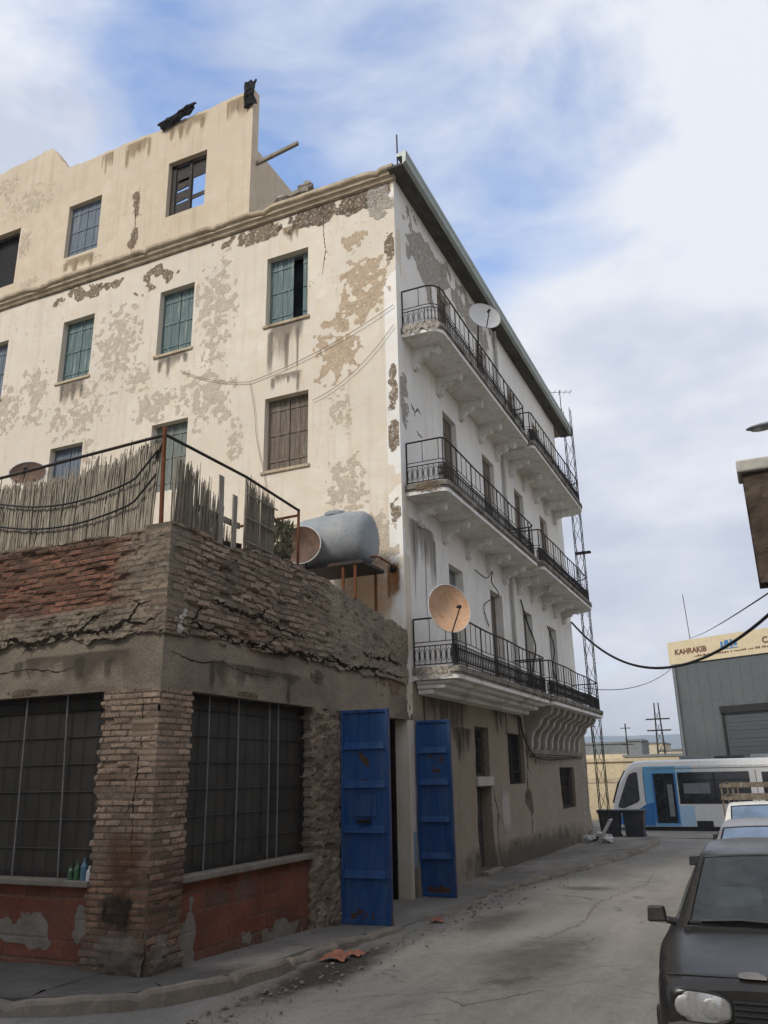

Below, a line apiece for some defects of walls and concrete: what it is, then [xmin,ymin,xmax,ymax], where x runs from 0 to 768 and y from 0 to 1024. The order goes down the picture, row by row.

damp [102,138,151,171]
damp [168,113,204,138]
damp [227,96,244,118]
peeling [0,174,494,472]
peeling [325,450,401,572]
crack [0,599,405,680]
crack [123,708,143,866]
peeling [0,912,51,950]
peeling [179,897,196,965]
peeling [241,918,303,946]